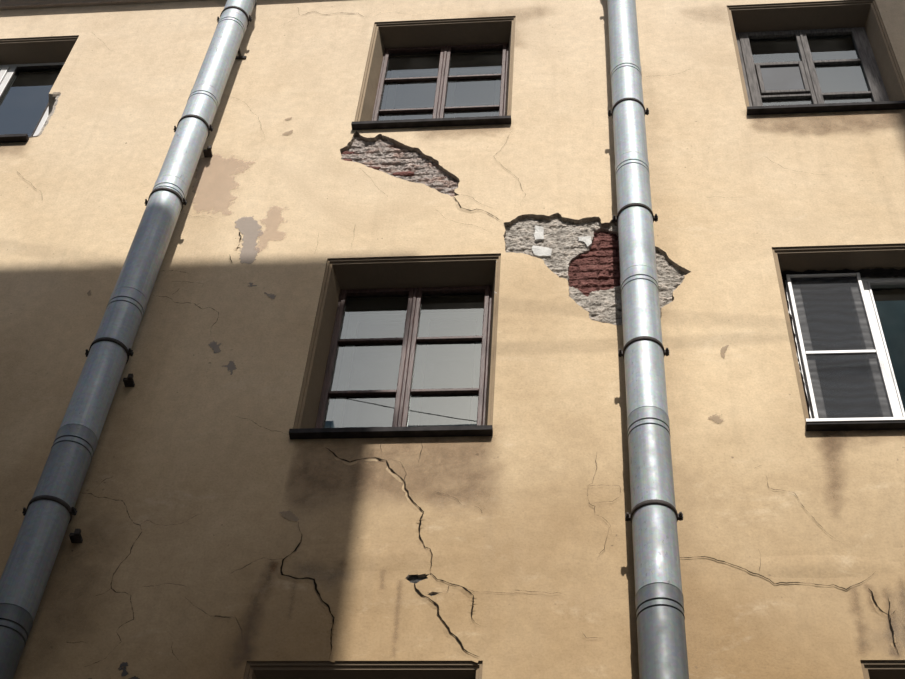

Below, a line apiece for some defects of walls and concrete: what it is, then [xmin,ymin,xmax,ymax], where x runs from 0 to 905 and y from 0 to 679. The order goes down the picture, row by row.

peeling [235,216,263,264]
spalling [340,131,460,196]
crack [440,195,503,230]
spalling [503,213,623,326]
spalling [655,246,691,317]
crack [232,523,338,662]
crack [325,445,557,663]
crack [680,556,904,657]